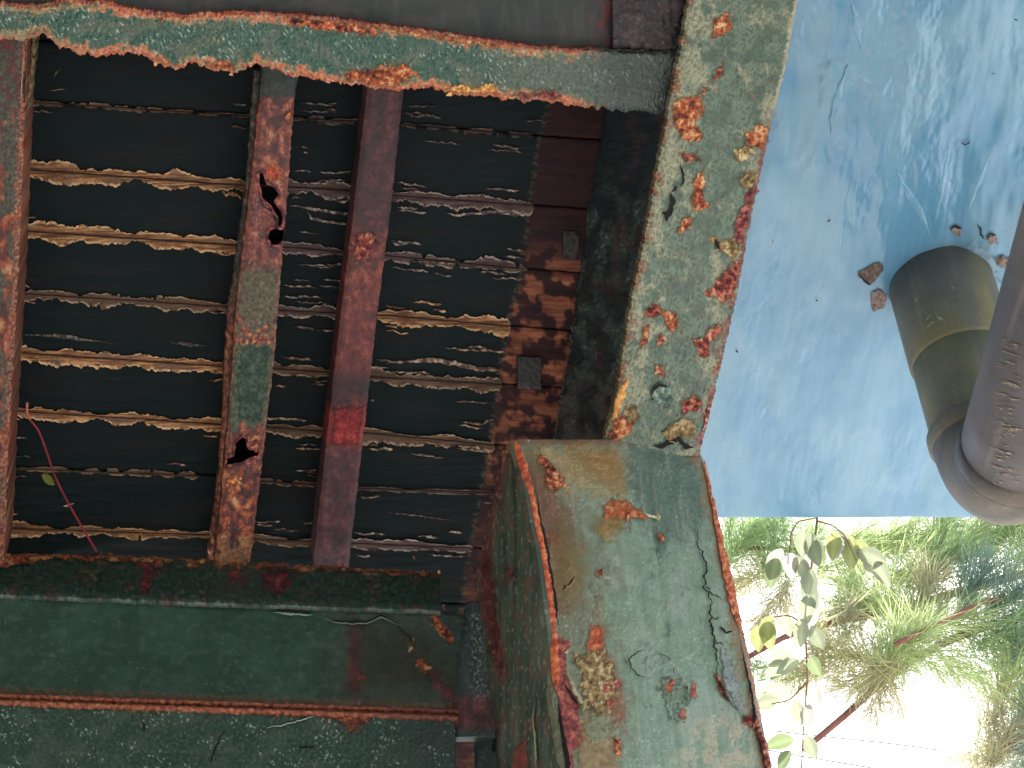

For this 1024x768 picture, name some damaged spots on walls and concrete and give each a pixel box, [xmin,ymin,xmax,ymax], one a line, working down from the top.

rust [443,83,497,96]
peeling [27,217,237,256]
peeling [30,159,245,199]
peeling [391,182,534,217]
rust [673,61,725,234]
rust [704,114,775,305]
peeling [24,284,228,314]
peeling [21,345,223,382]
peeling [370,300,511,404]
rust [608,377,640,441]
rust [499,442,567,690]
crack [696,502,767,768]